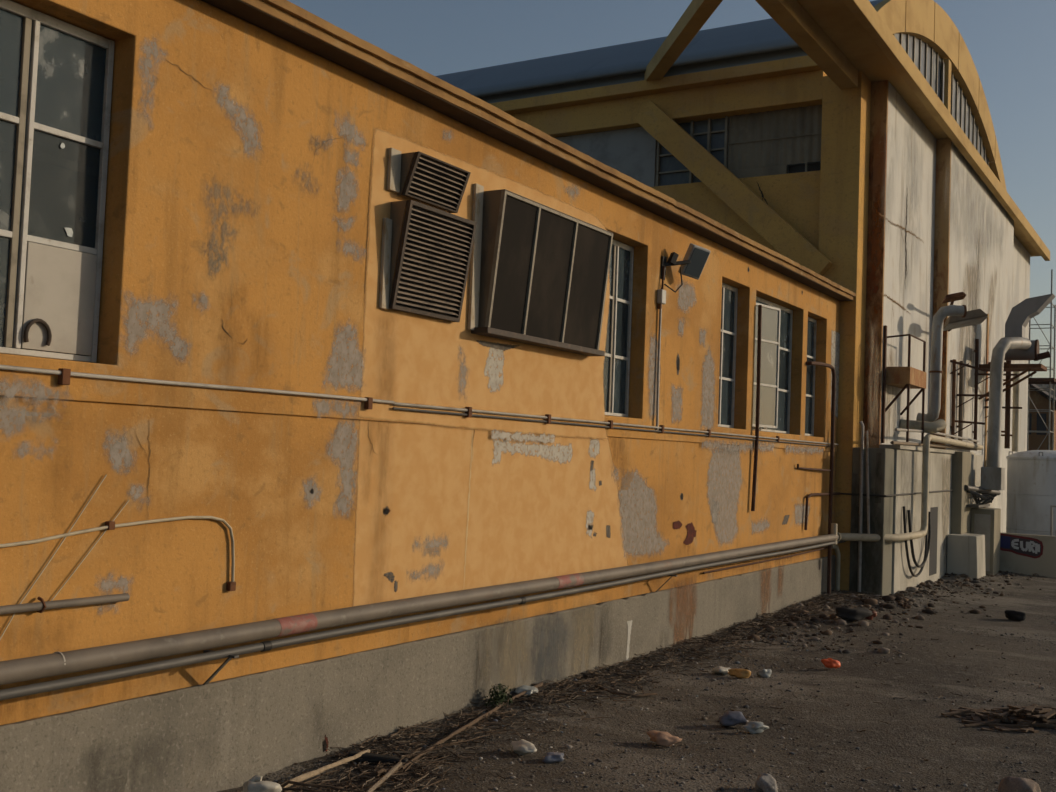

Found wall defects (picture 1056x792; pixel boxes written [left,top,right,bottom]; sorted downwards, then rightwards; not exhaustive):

peeling [218,86,260,154]
peeling [124,296,188,361]
rust [863,152,884,445]
peeling [313,325,364,515]
peeling [491,430,572,464]
peeling [588,439,602,491]
peeling [648,336,658,416]
peeling [672,354,682,423]
peeling [699,330,823,545]
peeling [586,469,667,556]
rust [673,521,697,545]
rust [670,580,695,644]